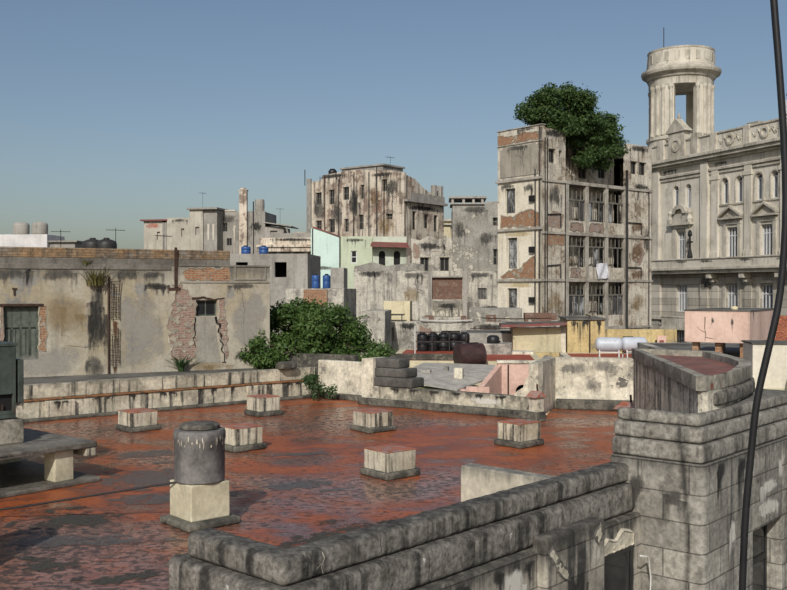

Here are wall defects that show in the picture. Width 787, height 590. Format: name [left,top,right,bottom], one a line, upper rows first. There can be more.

spalling [497,131,539,146]
water stain [371,173,398,201]
water stain [315,190,360,221]
spalling [500,208,604,246]
water stain [0,257,230,293]
spalling [501,256,534,279]
spalling [37,305,49,352]
water stain [88,287,108,345]
spalling [166,267,231,362]
crack [215,293,246,363]
water stain [85,358,101,375]
water stain [494,572,510,590]